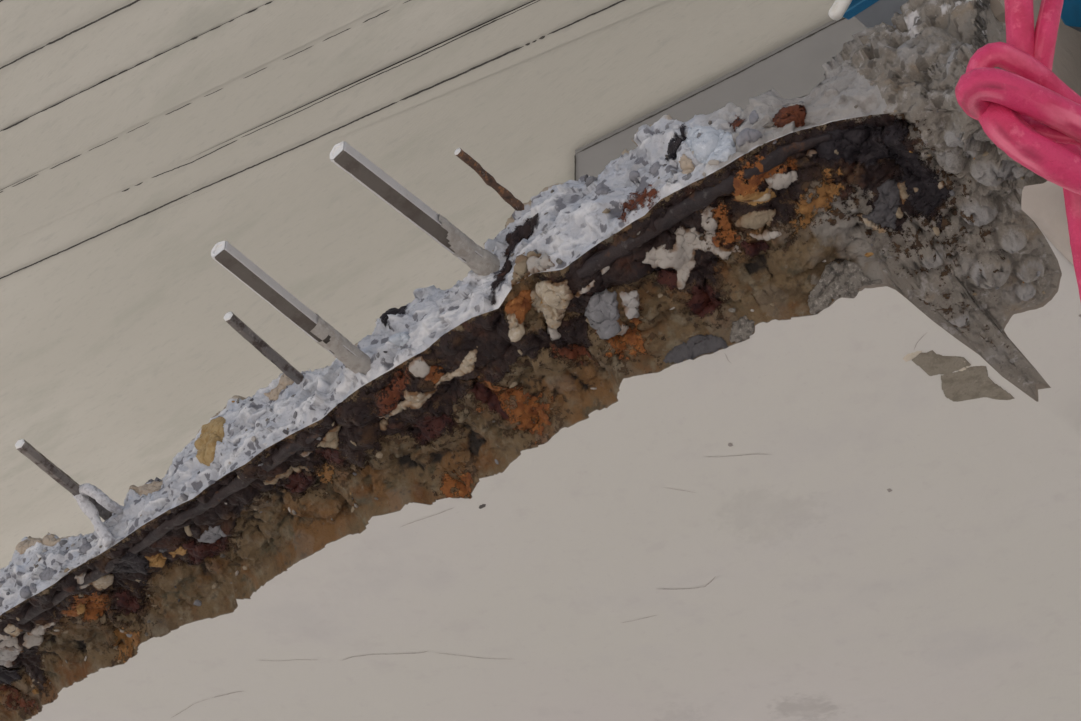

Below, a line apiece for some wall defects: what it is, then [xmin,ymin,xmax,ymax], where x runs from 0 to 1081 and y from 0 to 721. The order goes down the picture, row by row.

crack [0,0,626,279]
spalling [0,53,896,721]
rust [0,104,1009,721]
crack [489,213,538,305]
crack [574,18,846,181]
spalling [840,0,1062,402]